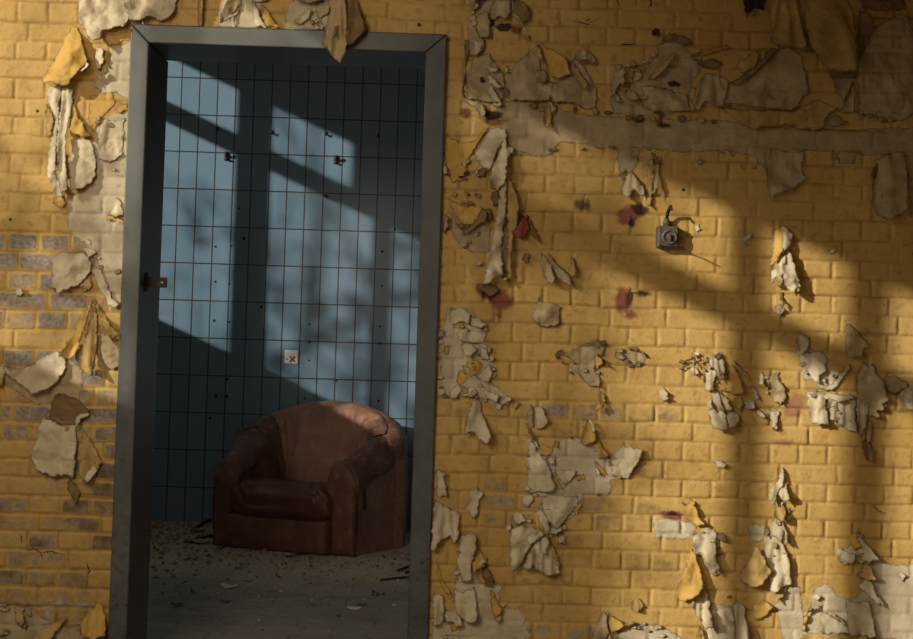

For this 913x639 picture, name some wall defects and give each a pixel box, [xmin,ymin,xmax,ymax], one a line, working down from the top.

peeling [217,0,365,63]
peeling [442,0,913,296]
peeling [0,0,177,503]
peeling [436,307,512,444]
peeling [532,297,561,328]
peeling [555,339,648,387]
peeling [679,351,787,431]
peeling [769,224,801,315]
peeling [795,324,913,462]
peeling [430,469,532,639]
peeling [506,404,642,576]
peeling [590,467,913,639]